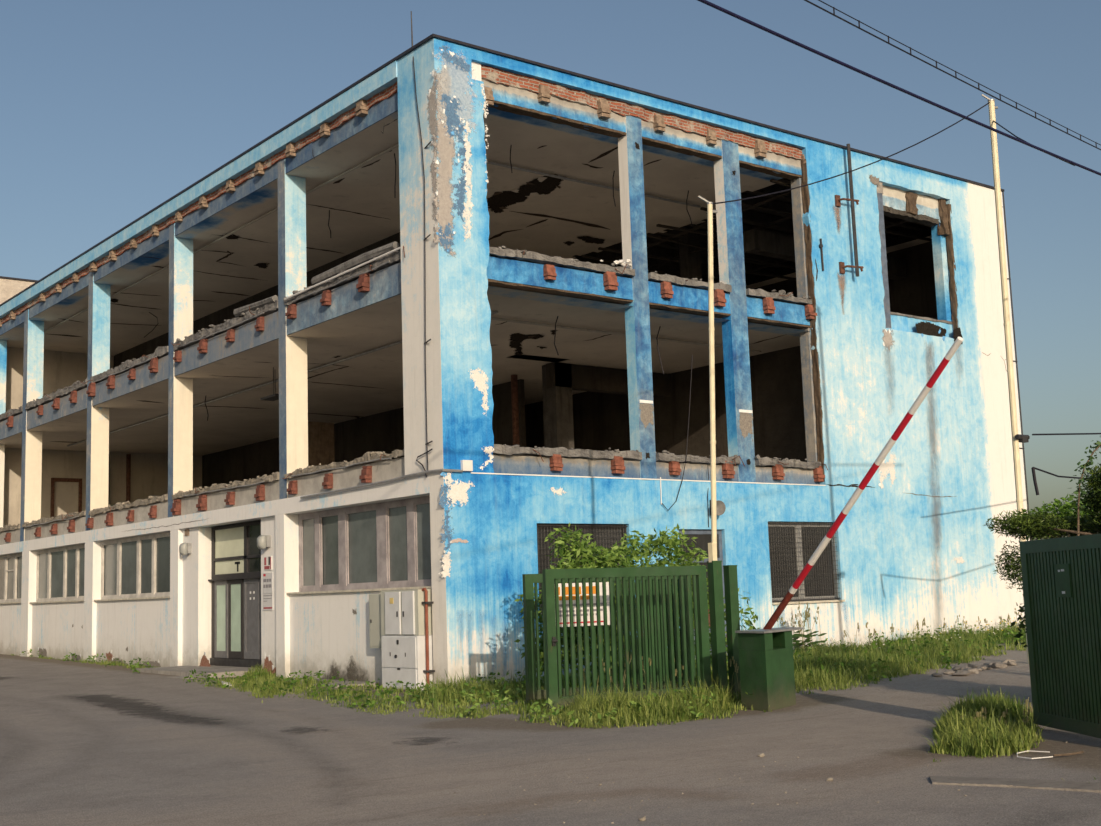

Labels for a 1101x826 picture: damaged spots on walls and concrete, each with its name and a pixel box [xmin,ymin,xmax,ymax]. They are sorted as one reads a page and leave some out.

peeling [427,45,722,256]
spalling [510,330,558,356]
peeling [468,367,489,415]
spalling [739,409,753,442]
spalling [480,444,828,470]
peeling [878,450,896,489]
peeling [439,472,475,578]